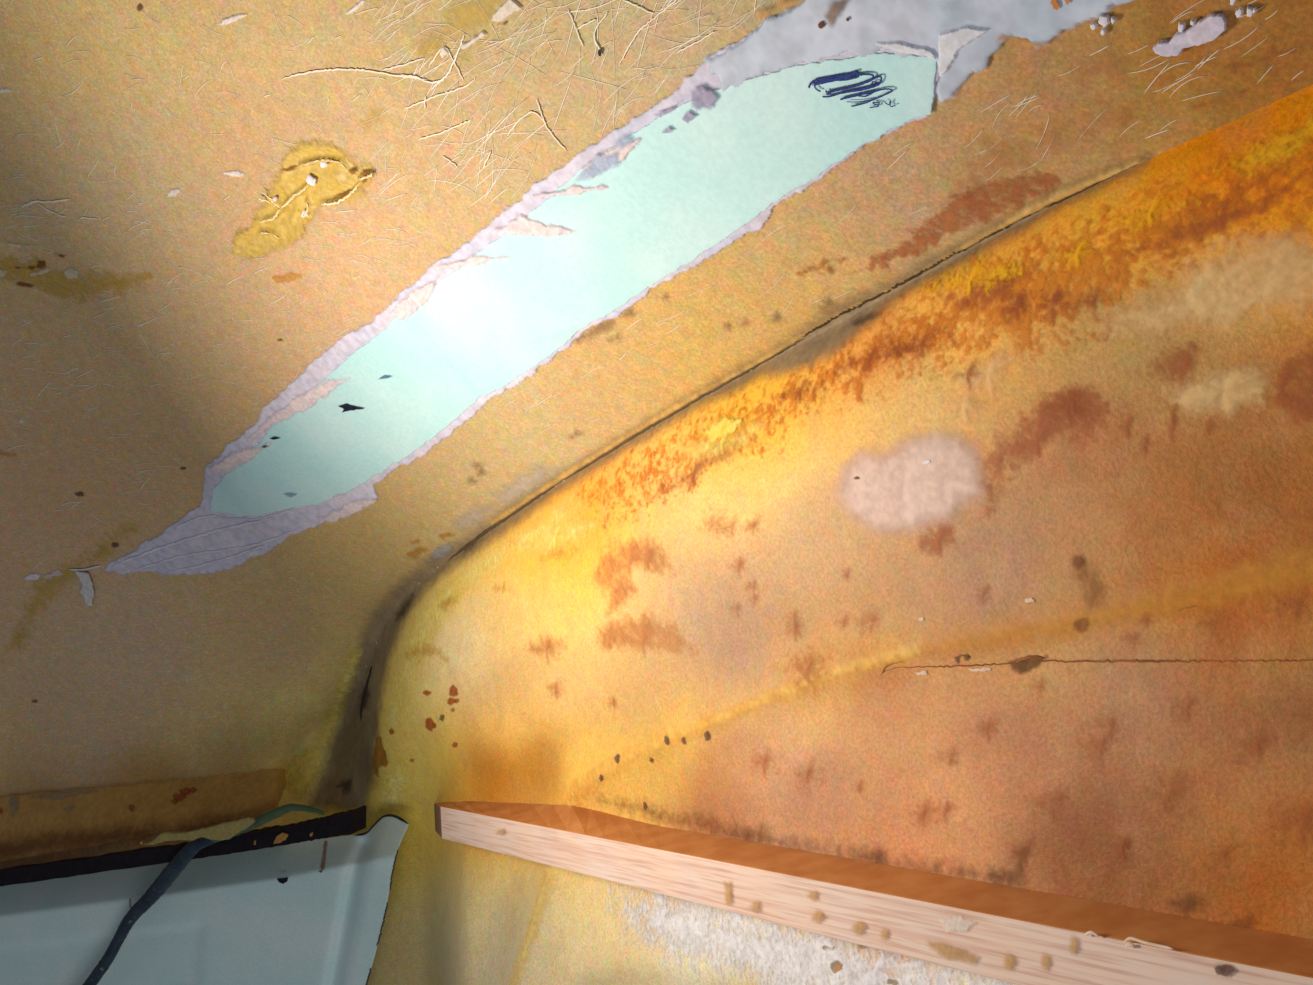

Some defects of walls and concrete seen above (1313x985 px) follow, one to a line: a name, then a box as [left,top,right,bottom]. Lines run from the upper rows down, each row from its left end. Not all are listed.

leakage [0,242,151,302]
peeling [1116,238,1313,331]
peeling [24,33,939,606]
corrosion [582,129,1313,528]
peeling [1175,368,1262,414]
peeling [839,435,979,531]
corrosion [598,543,664,605]
corrosion [603,615,681,649]
crack [880,655,1313,675]
leakage [283,652,360,796]
corrosion [426,685,459,731]